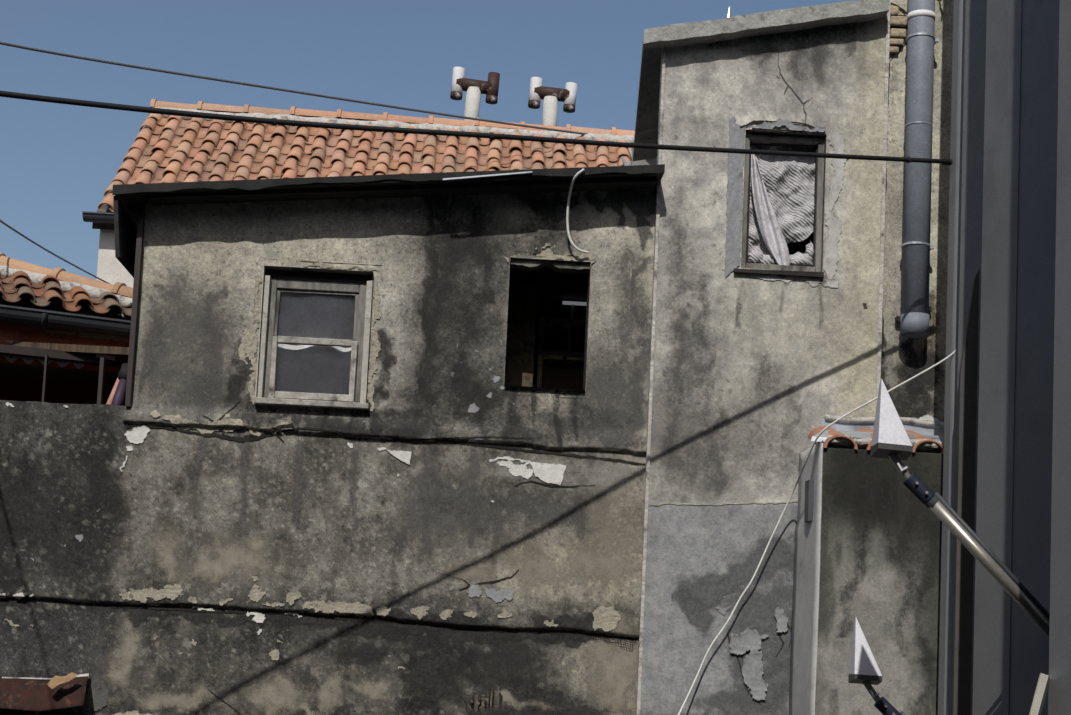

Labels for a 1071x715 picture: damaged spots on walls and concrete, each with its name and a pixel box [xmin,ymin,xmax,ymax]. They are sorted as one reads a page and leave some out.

crack [739,47,815,134]
flaking render [238,275,262,404]
water stain [138,188,656,562]
water stain [0,406,126,600]
flaking render [119,410,287,472]
crack [126,400,646,465]
peeling [377,447,411,465]
peeling [489,456,566,485]
crack [514,479,595,487]
water stain [110,576,636,715]
crack [119,570,639,640]
water stain [671,535,795,715]